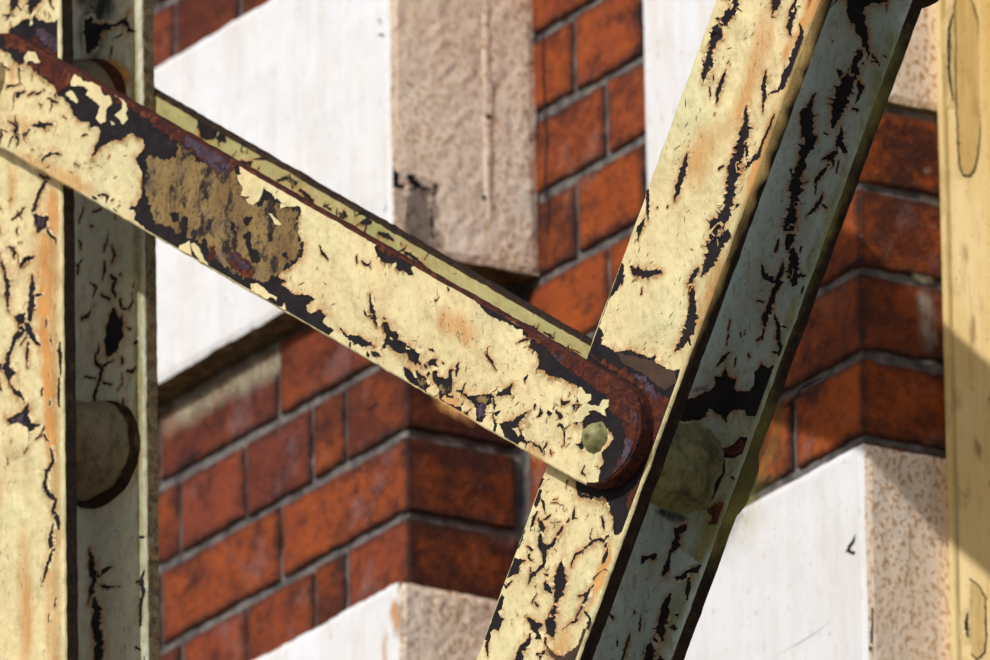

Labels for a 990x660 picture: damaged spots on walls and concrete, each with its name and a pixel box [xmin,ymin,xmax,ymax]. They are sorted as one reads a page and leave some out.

rust [88,58,130,96]
peeling [679,0,898,432]
peeling [0,0,680,660]
peeling [703,437,748,525]
peeling [637,514,701,601]